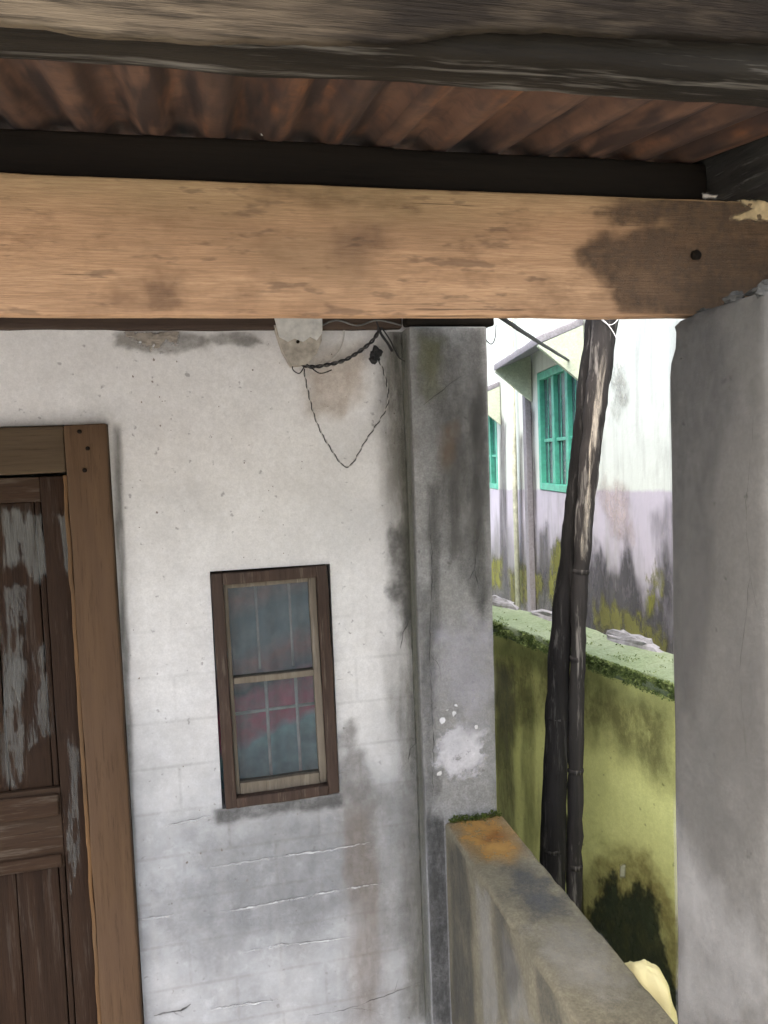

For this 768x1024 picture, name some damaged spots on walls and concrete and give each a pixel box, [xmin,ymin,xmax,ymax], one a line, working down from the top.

leakage [578,200,768,314]
leakage [386,336,412,632]
peeling [437,704,484,776]
crack [228,842,369,866]
rust [460,817,519,860]
crack [237,883,377,911]